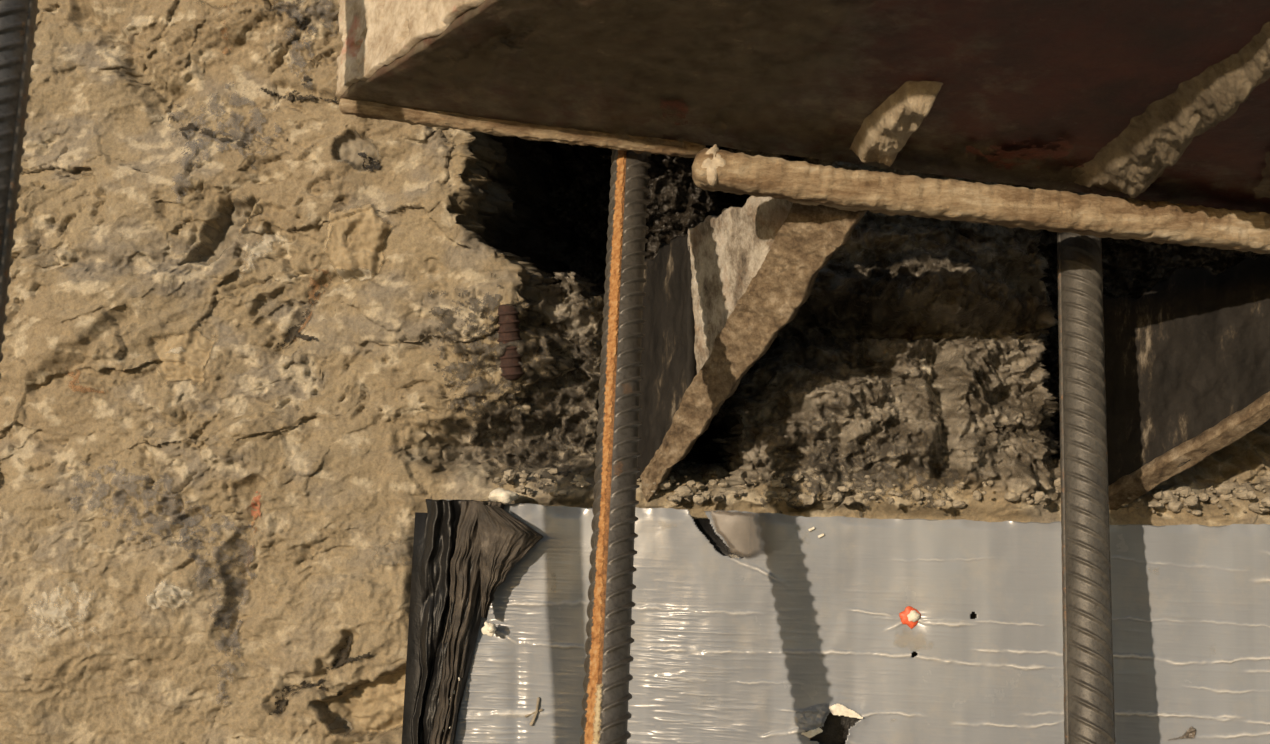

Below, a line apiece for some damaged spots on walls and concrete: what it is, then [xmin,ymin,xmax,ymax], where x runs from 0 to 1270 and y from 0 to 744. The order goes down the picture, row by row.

peeling [894,149,1115,196]